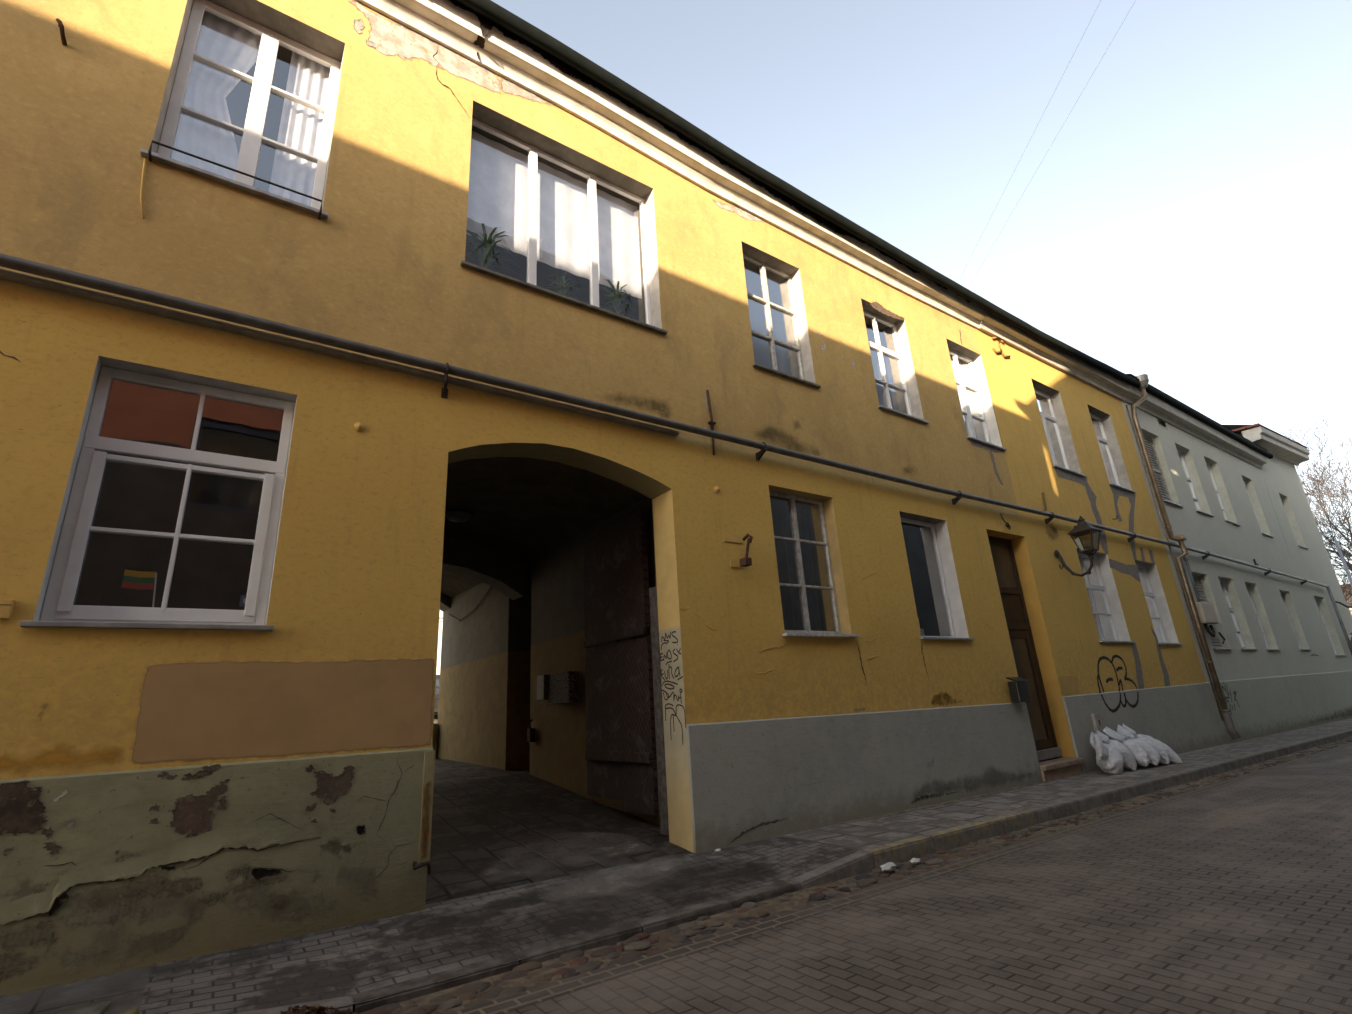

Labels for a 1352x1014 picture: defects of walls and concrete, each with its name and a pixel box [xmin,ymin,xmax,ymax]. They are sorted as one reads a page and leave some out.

crack [433,29,467,114]
flaking render [348,0,556,106]
spalling [450,0,971,303]
flaking render [0,780,62,856]
flaking render [149,764,230,838]
flaking render [305,765,355,823]
flaking render [49,893,69,915]
crack [0,813,320,926]
flaking render [251,868,281,880]